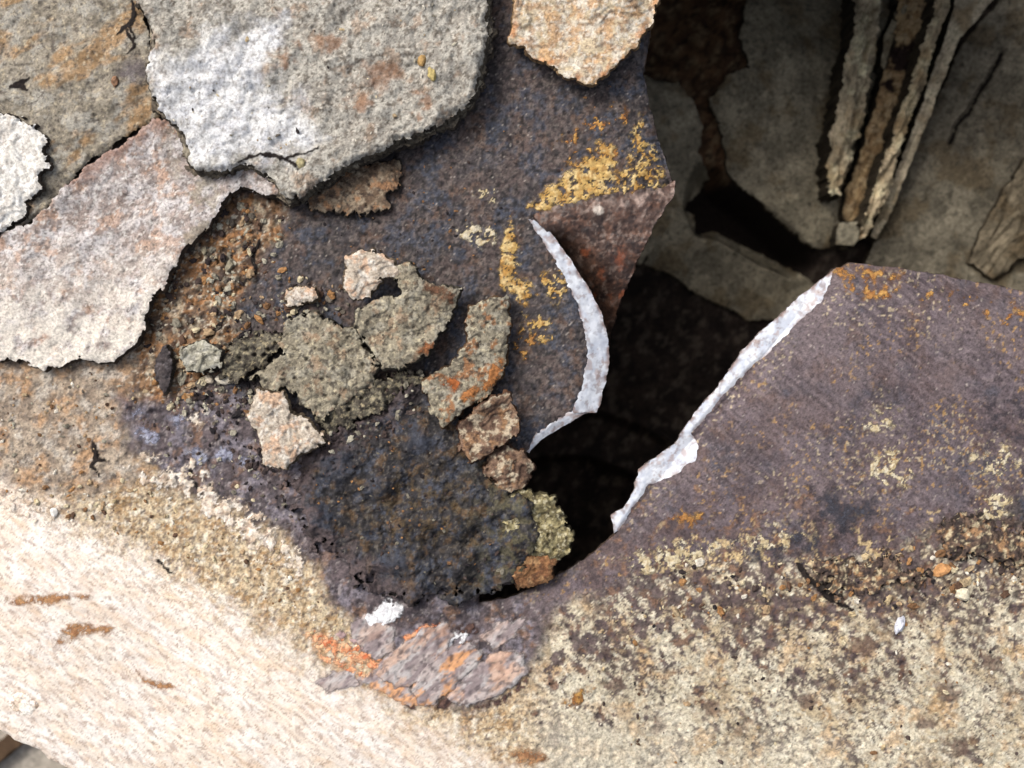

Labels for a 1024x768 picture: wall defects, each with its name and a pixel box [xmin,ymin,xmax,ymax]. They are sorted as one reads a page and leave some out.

crack [116,0,137,54]
peeling [0,0,661,235]
crack [238,146,319,170]
rust [832,264,905,299]
peeling [245,215,575,590]
efflorescence [133,408,159,444]
efflorescence [186,446,247,465]
leakage [817,487,878,539]
leakage [751,526,820,563]
rust [304,631,383,677]
rust [437,698,451,710]
rust [474,668,532,708]